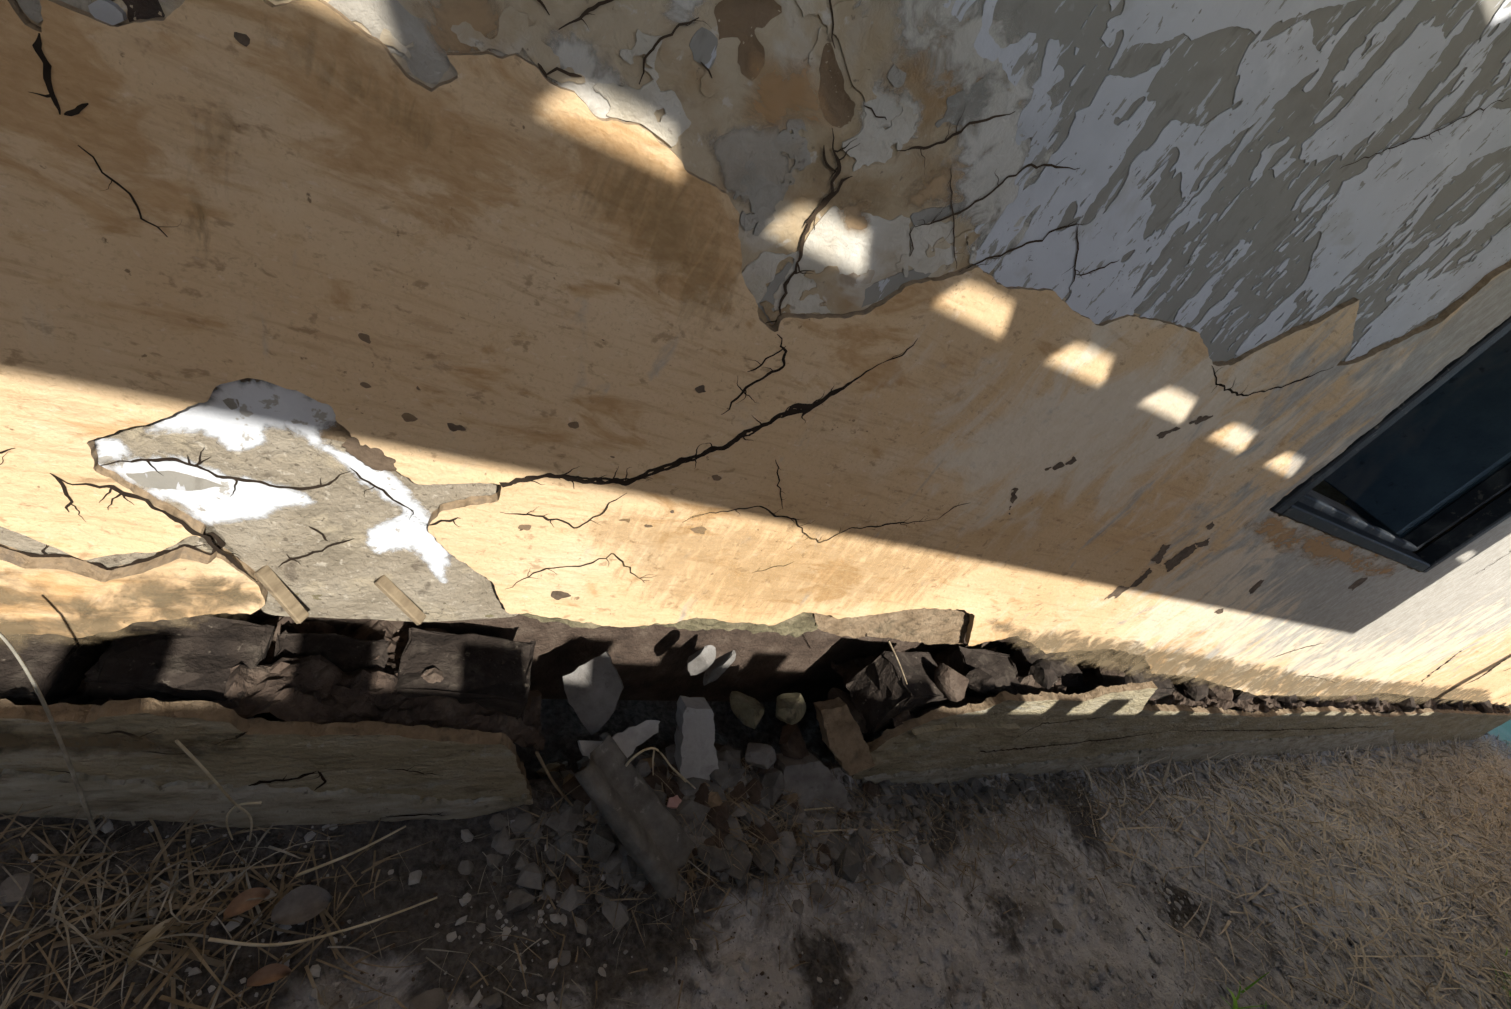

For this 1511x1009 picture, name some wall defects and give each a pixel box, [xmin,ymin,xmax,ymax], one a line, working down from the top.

flaking render [16,0,43,27]
spalling [60,0,185,24]
flaking render [234,32,250,47]
crack [829,0,861,48]
crack [30,33,179,237]
peeling [324,0,1511,362]
crack [499,103,1119,589]
flaking render [0,380,601,629]
crack [980,716,1392,753]